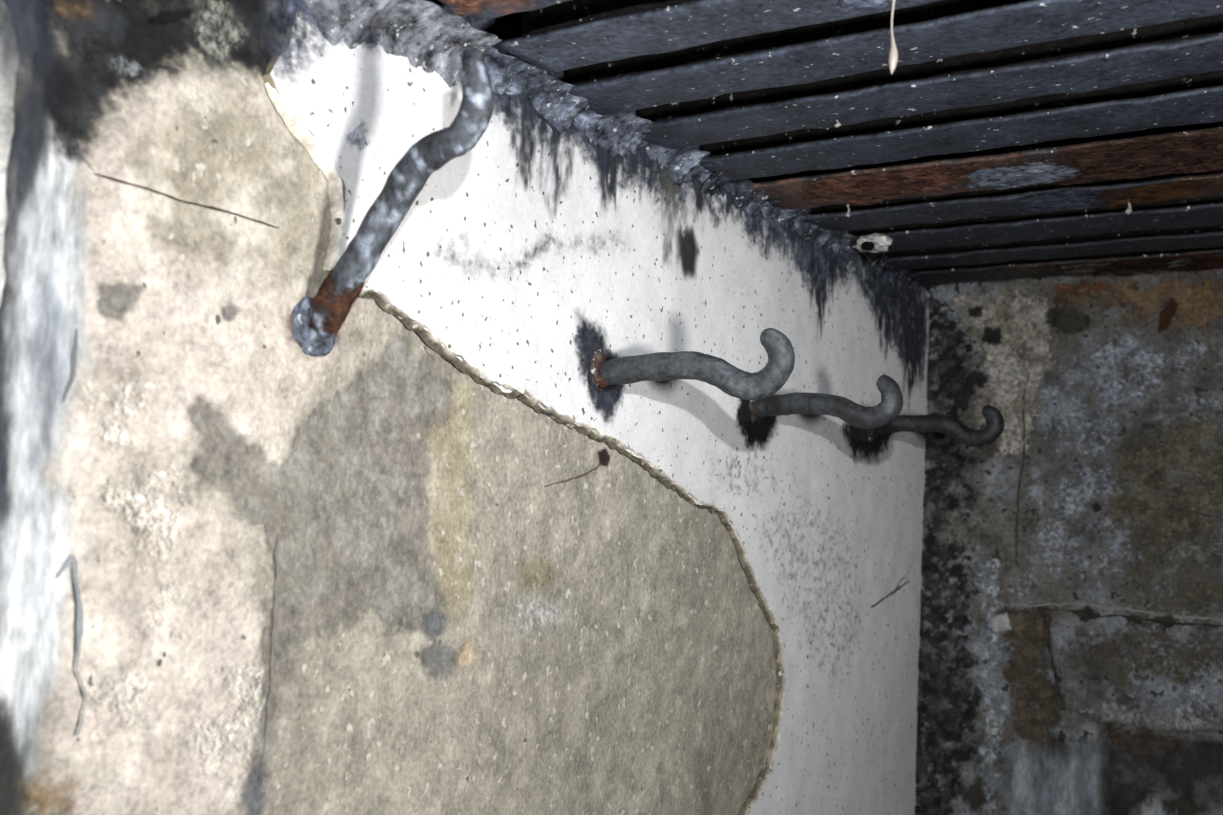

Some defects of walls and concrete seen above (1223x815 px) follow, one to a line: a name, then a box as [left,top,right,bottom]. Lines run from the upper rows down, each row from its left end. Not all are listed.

damp [507,96,572,202]
damp [597,143,679,259]
damp [694,177,711,213]
damp [796,238,837,334]
damp [861,257,1002,420]
damp [1045,306,1090,335]
flaking render [0,0,786,815]
damp [0,125,155,815]
damp [101,334,474,786]
damp [915,329,1223,815]
crack [995,603,1223,711]